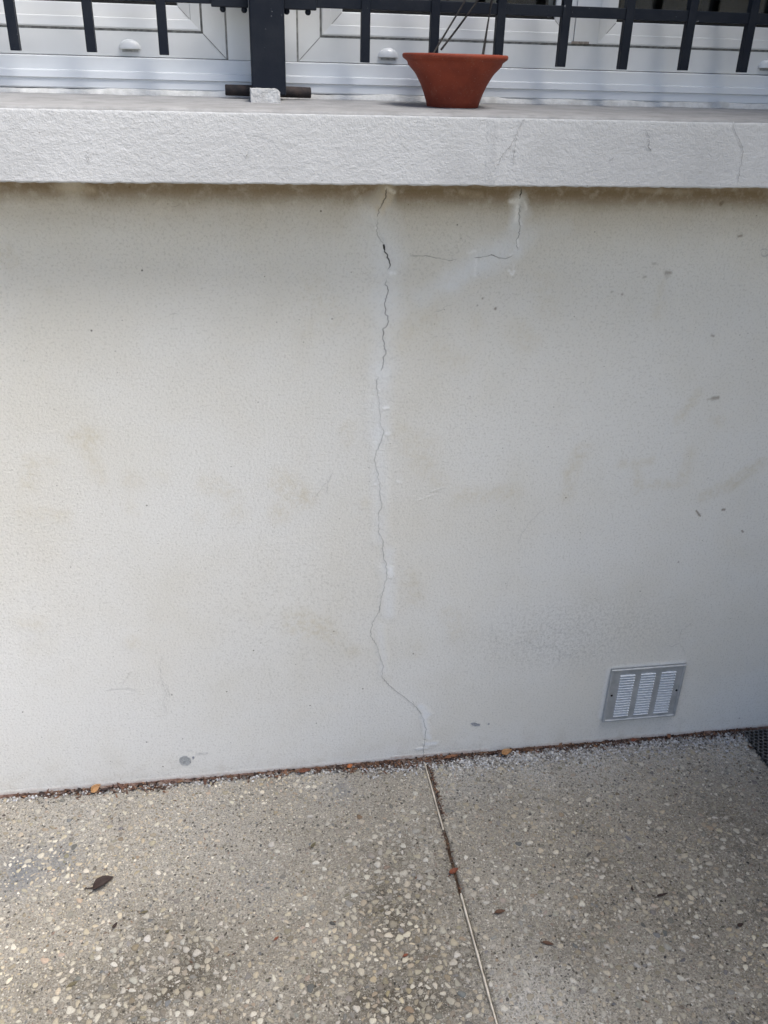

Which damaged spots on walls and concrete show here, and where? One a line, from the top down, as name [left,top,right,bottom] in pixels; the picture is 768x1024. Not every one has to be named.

crack [340,184,575,756]